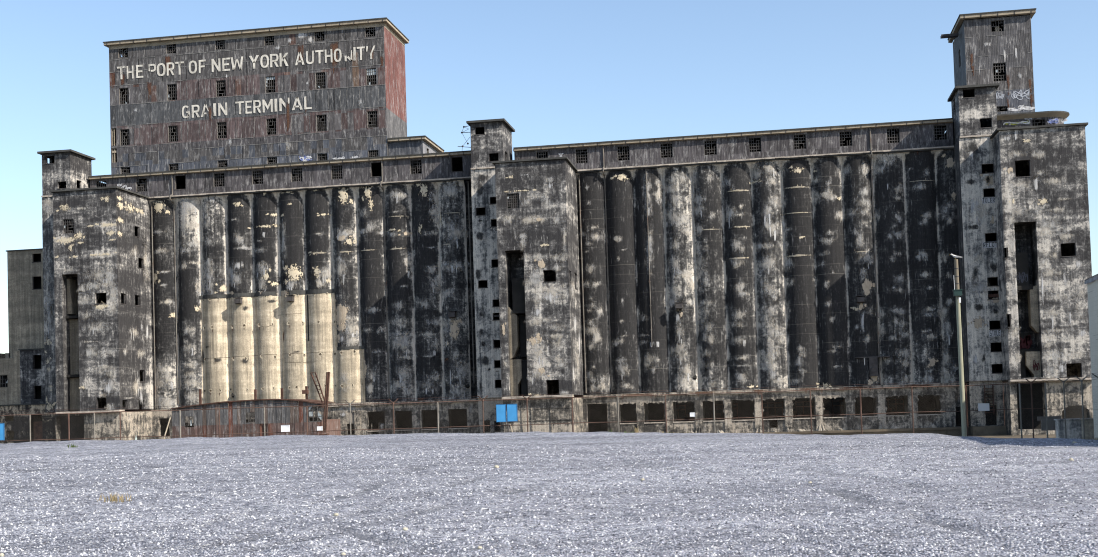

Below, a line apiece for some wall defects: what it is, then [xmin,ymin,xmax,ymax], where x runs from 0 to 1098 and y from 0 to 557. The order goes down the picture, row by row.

peeling [53,196,170,258]
leakage [180,198,214,300]
leakage [236,232,268,292]
leakage [316,257,345,287]
peeling [338,183,374,211]
leakage [641,167,742,389]
leakage [756,197,803,383]
leakage [811,159,837,202]
spalling [850,275,876,311]
leakage [836,155,895,274]
leakage [341,302,472,413]
leakage [855,298,957,384]